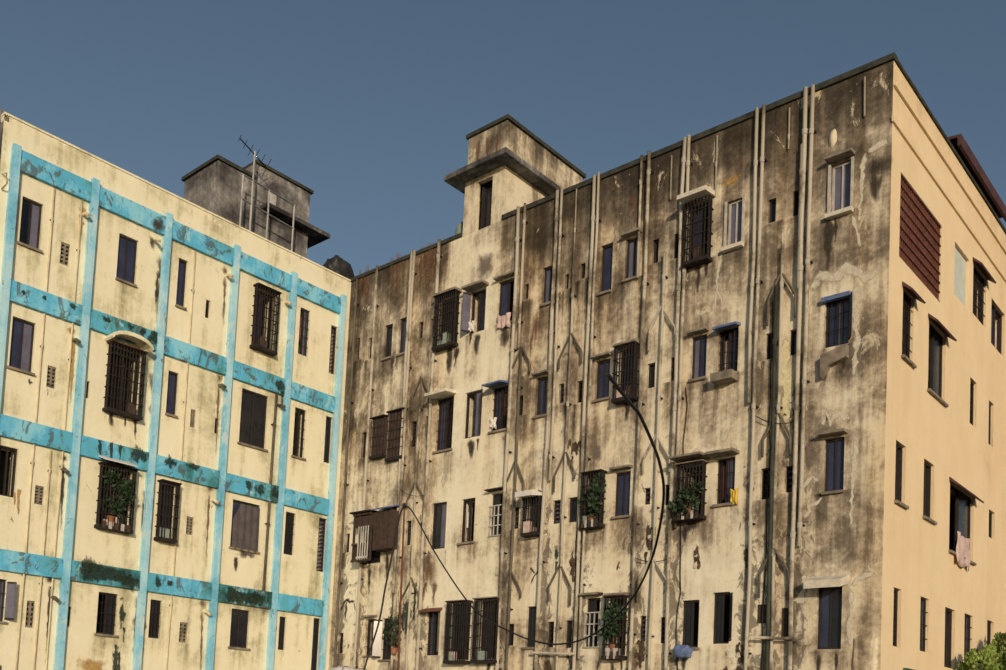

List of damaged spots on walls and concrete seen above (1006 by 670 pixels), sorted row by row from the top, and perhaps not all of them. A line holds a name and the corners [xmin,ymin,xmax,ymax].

damp [869,160,887,199]
damp [805,441,815,467]
flaking render [693,545,701,569]
flaking render [723,642,749,670]